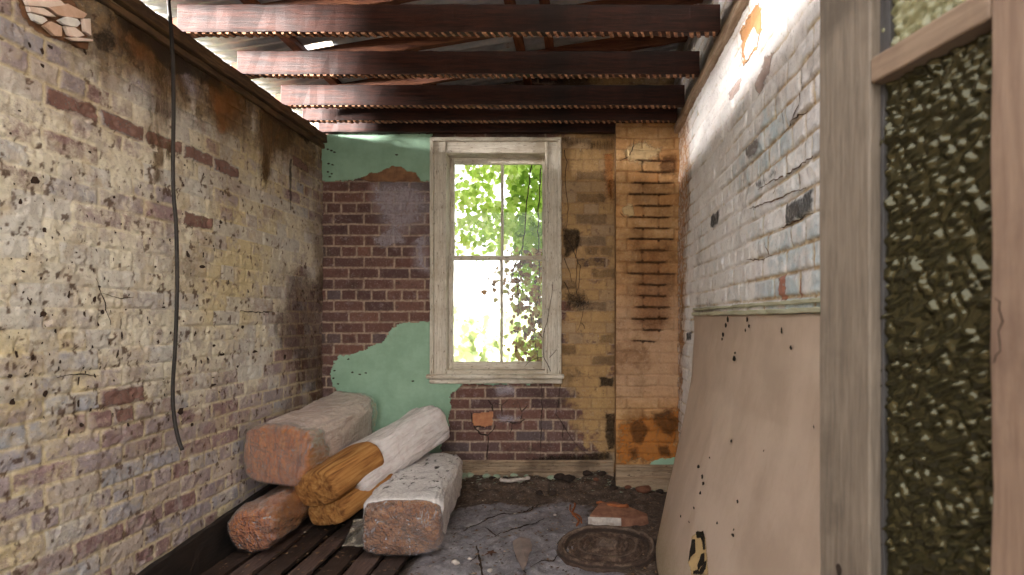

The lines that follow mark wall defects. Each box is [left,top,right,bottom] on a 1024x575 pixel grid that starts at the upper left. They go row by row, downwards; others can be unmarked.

peeling [739,4,773,94]
water stain [93,15,309,210]
flaking render [321,133,433,182]
crack [747,69,813,261]
flaking render [330,321,507,431]
crack [471,385,543,459]